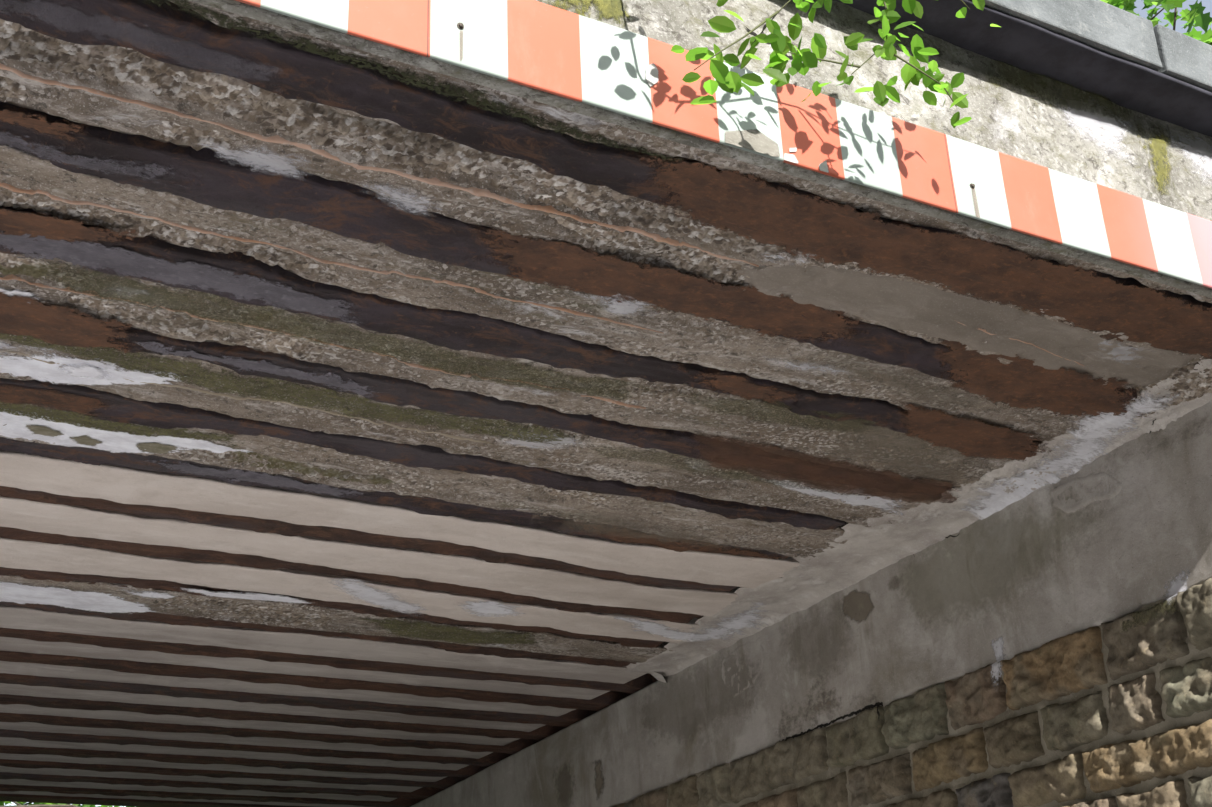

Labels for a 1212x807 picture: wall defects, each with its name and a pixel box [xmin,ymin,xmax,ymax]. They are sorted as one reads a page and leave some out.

spalling [0,19,809,288]
corrosion [0,292,134,353]
corrosion [0,208,152,248]
peeling [0,191,380,398]
corrosion [468,225,868,346]
corrosion [631,156,1212,359]
damp [0,343,186,386]
damp [0,409,251,454]
spalling [168,444,398,485]
damp [961,395,1177,520]
damp [0,582,310,614]
crack [775,702,883,745]